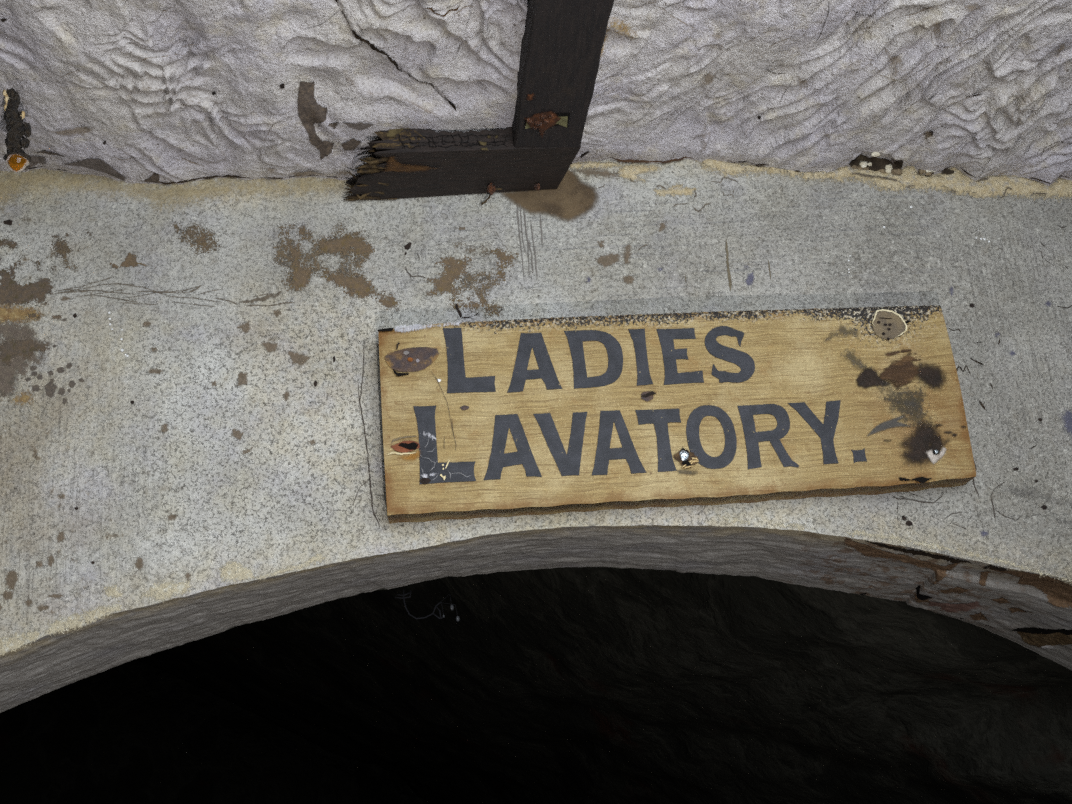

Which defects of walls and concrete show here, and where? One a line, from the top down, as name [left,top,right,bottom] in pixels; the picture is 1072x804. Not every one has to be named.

rust [3,88,32,172]
leakage [0,322,84,405]
flaking render [845,539,968,603]
flaking render [975,563,1072,608]
spalling [1011,627,1072,649]